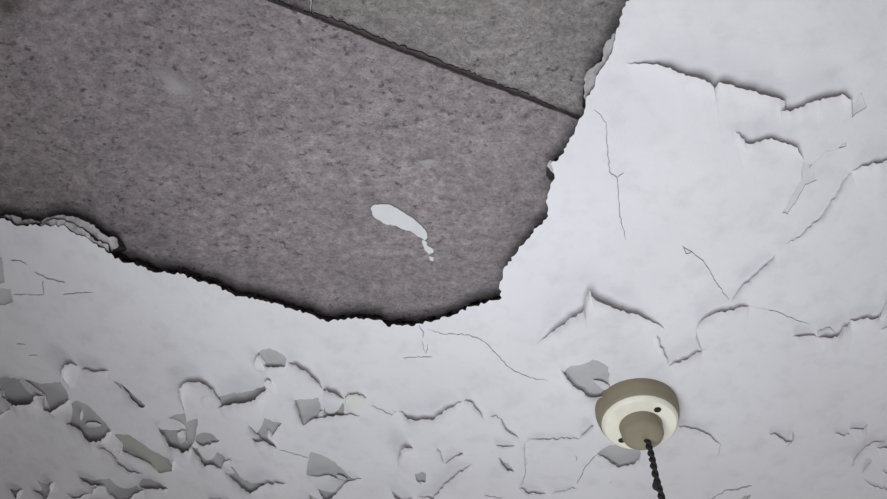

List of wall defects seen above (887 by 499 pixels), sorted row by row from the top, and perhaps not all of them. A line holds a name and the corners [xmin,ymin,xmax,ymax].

flaking render [0,0,629,327]
crack [596,111,626,239]
peeling [626,63,867,214]
peeling [787,160,887,244]
crack [10,259,93,296]
crack [683,246,726,296]
crack [406,326,547,381]
peeling [537,255,777,408]
peeling [793,302,887,368]
peeling [0,348,363,499]
peeling [398,400,500,485]
peeling [597,444,641,483]